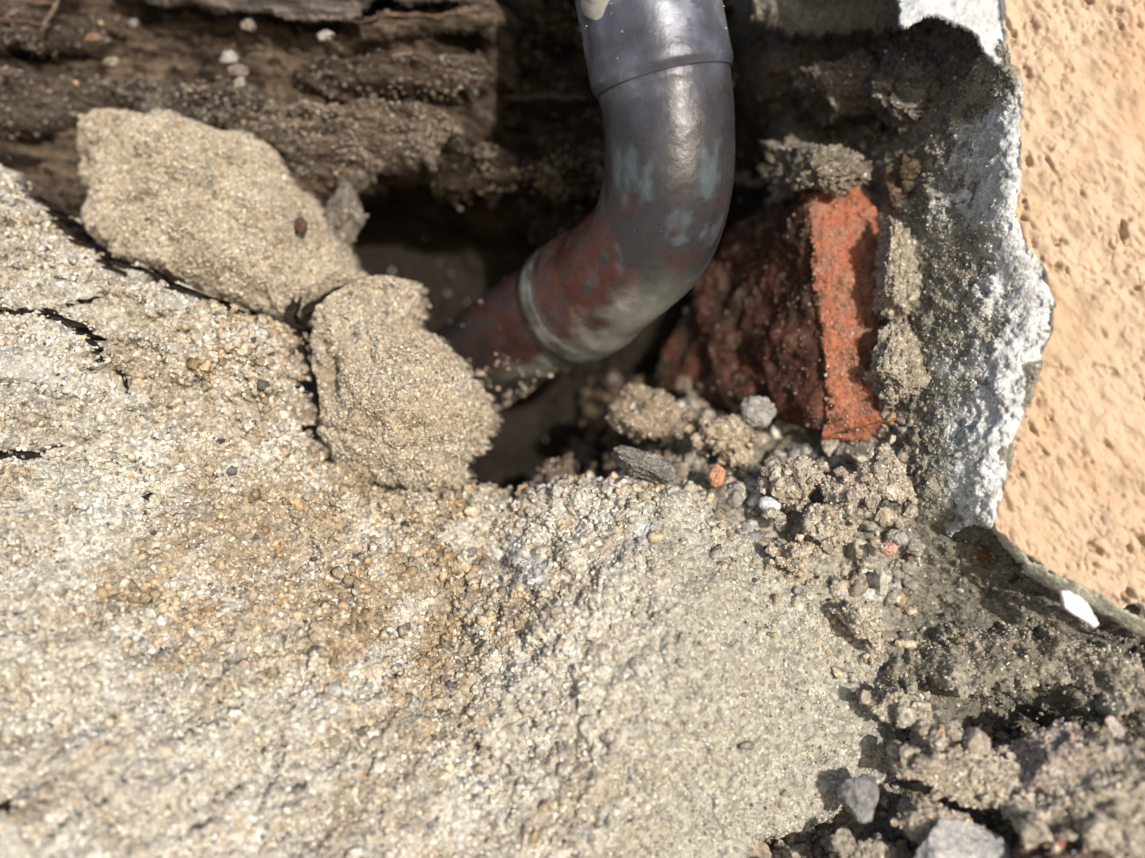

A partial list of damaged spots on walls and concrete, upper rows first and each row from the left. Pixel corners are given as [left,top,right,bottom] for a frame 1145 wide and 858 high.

crack [28,192,347,372]
crack [0,296,129,394]
crack [0,445,61,460]